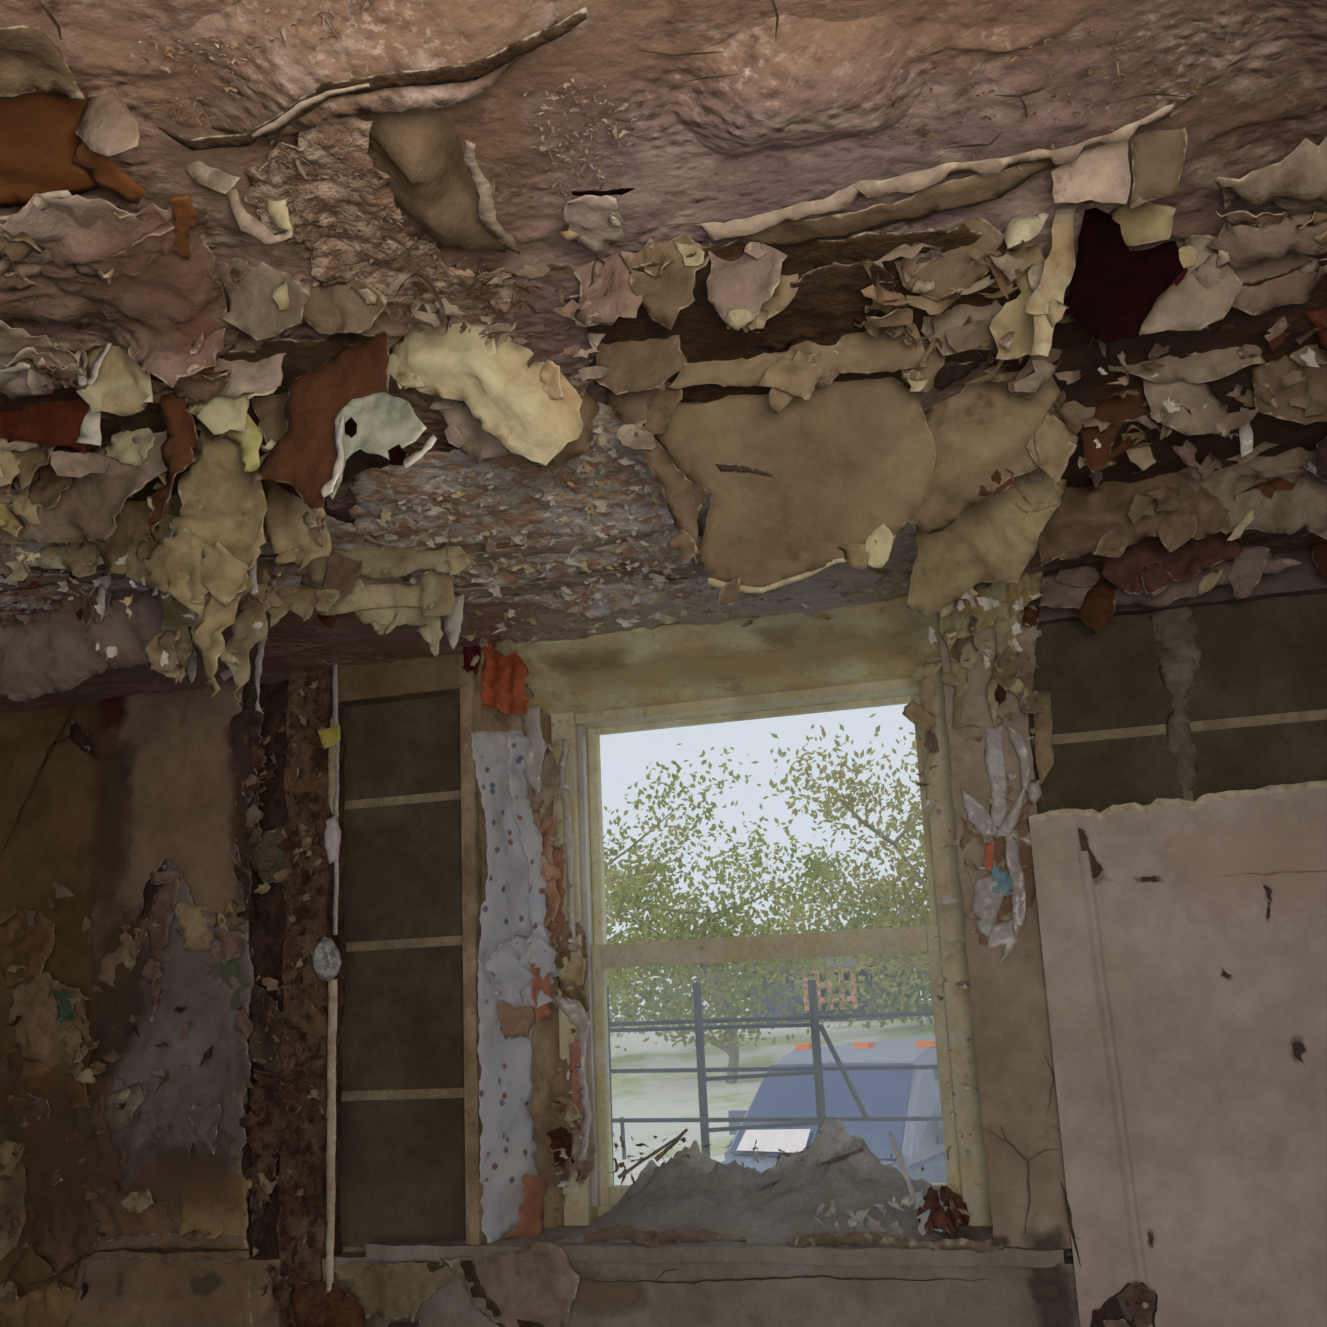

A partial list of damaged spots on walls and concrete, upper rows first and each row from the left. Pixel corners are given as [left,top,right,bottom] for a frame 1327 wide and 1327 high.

peeling [128,0,373,127]
peeling [0,25,147,225]
peeling [170,29,1327,648]
peeling [0,386,166,503]
peeling [119,403,201,518]
peeling [0,525,152,627]
peeling [916,765,1032,846]
spalling [0,664,585,1327]
crack [1044,1051,1055,1115]
crack [982,1127,1081,1267]
spalling [1090,1282,1158,1327]